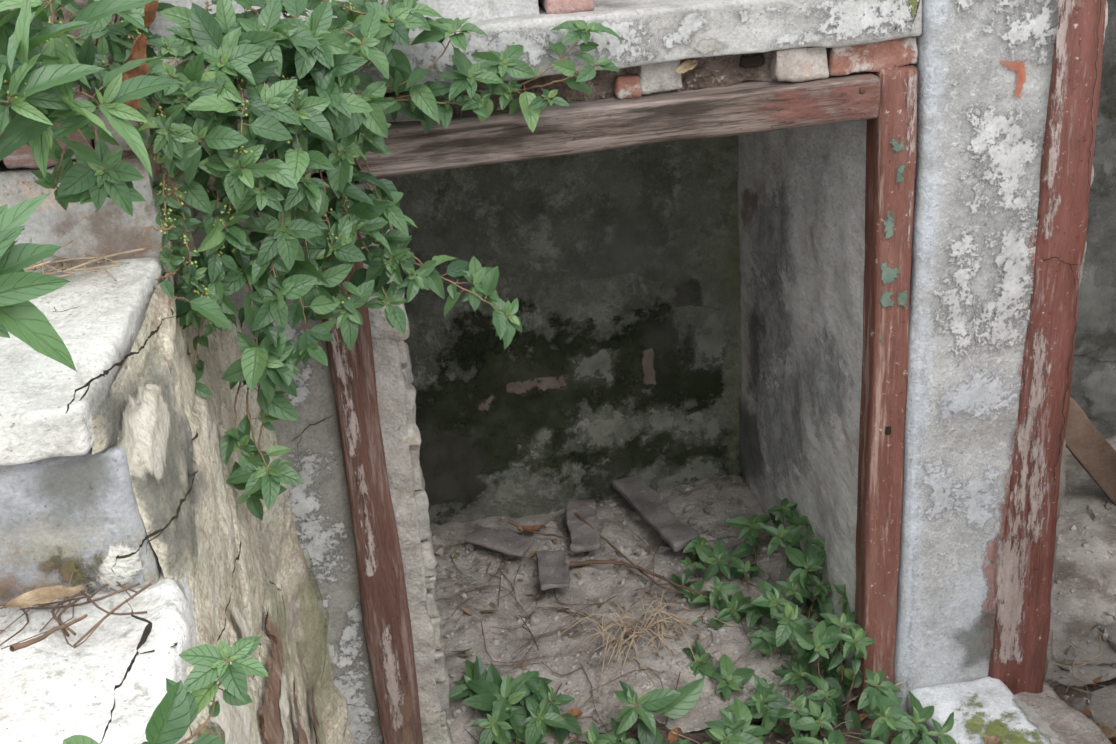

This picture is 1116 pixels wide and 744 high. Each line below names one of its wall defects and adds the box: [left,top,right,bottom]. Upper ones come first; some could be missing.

water stain [400,232,473,305]
crack [65,316,175,431]
flaking render [478,349,618,413]
water stain [414,233,764,524]
flaking render [641,348,657,385]
peeling [920,0,1083,664]
crack [99,419,198,744]
water stain [232,600,250,637]
crack [217,541,282,683]
water stain [279,672,290,744]